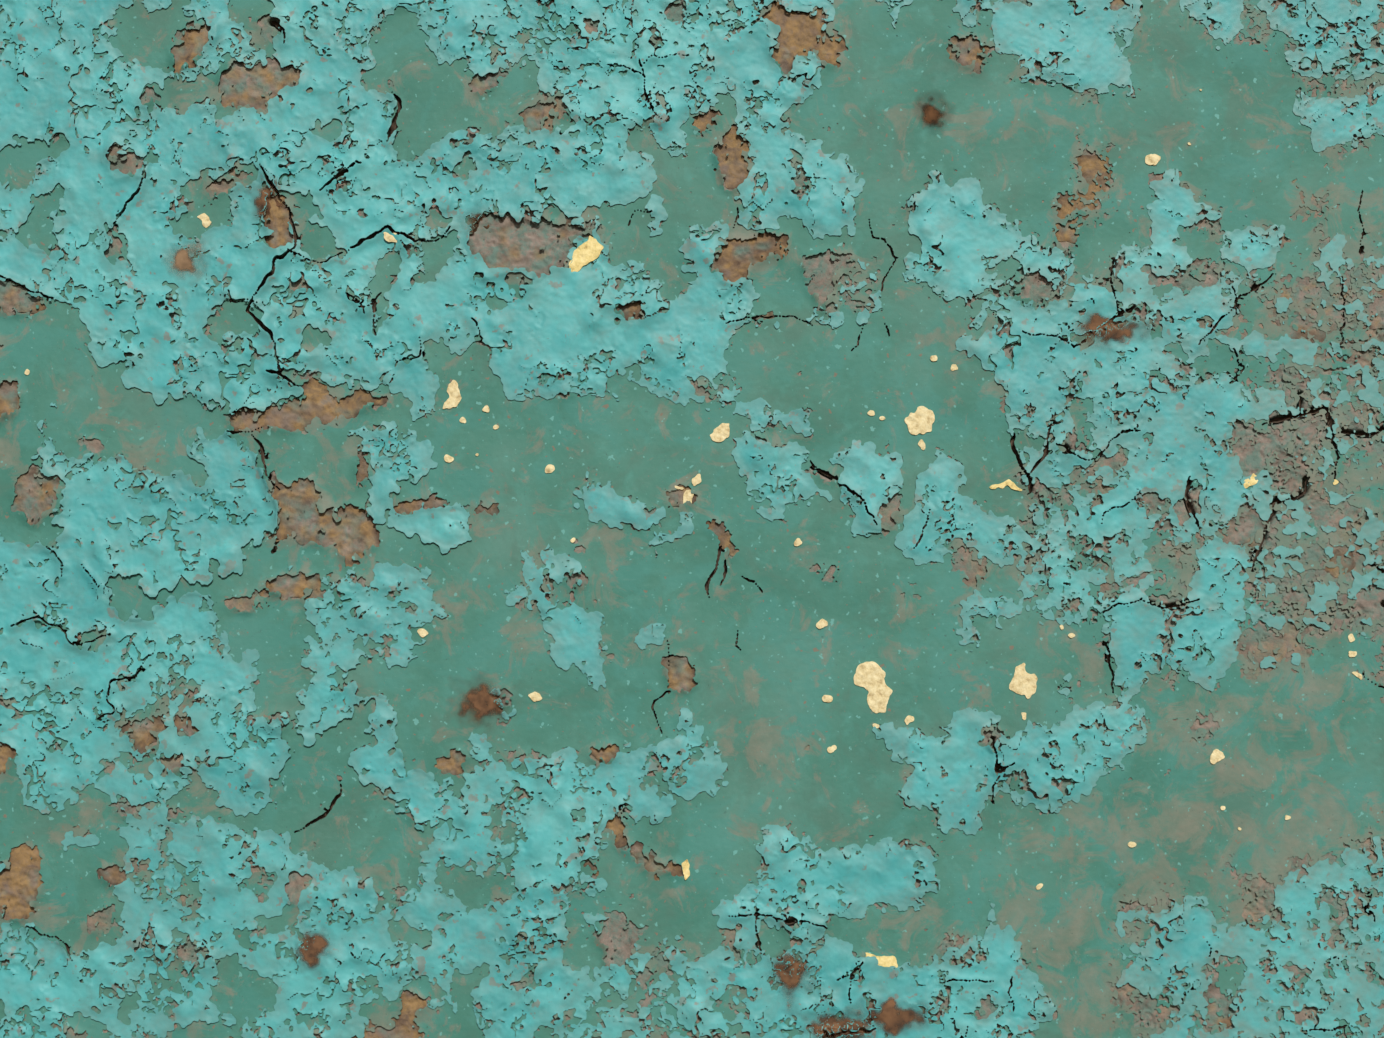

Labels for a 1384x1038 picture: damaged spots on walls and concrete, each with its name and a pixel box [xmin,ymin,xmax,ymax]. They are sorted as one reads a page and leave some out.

crack [229,166,450,387]
crack [320,161,361,191]
crack [388,94,402,140]
rust [472,213,491,233]
crack [851,221,897,351]
peeling [1179,0,1384,152]
peeling [0,0,1057,1038]
crack [705,546,763,597]
crack [1010,424,1139,493]
peeling [854,151,1384,835]
crack [1251,394,1384,570]
peeling [1115,834,1384,1038]